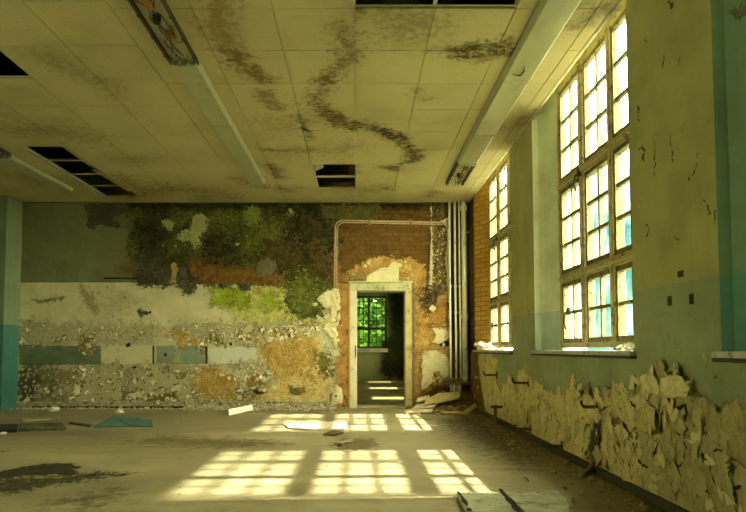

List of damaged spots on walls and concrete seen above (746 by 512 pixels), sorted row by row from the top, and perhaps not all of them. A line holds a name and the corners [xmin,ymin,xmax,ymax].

damp [446,37,517,63]
damp [308,21,423,171]
damp [177,257,199,295]
damp [218,282,288,315]
flaking render [17,197,746,512]